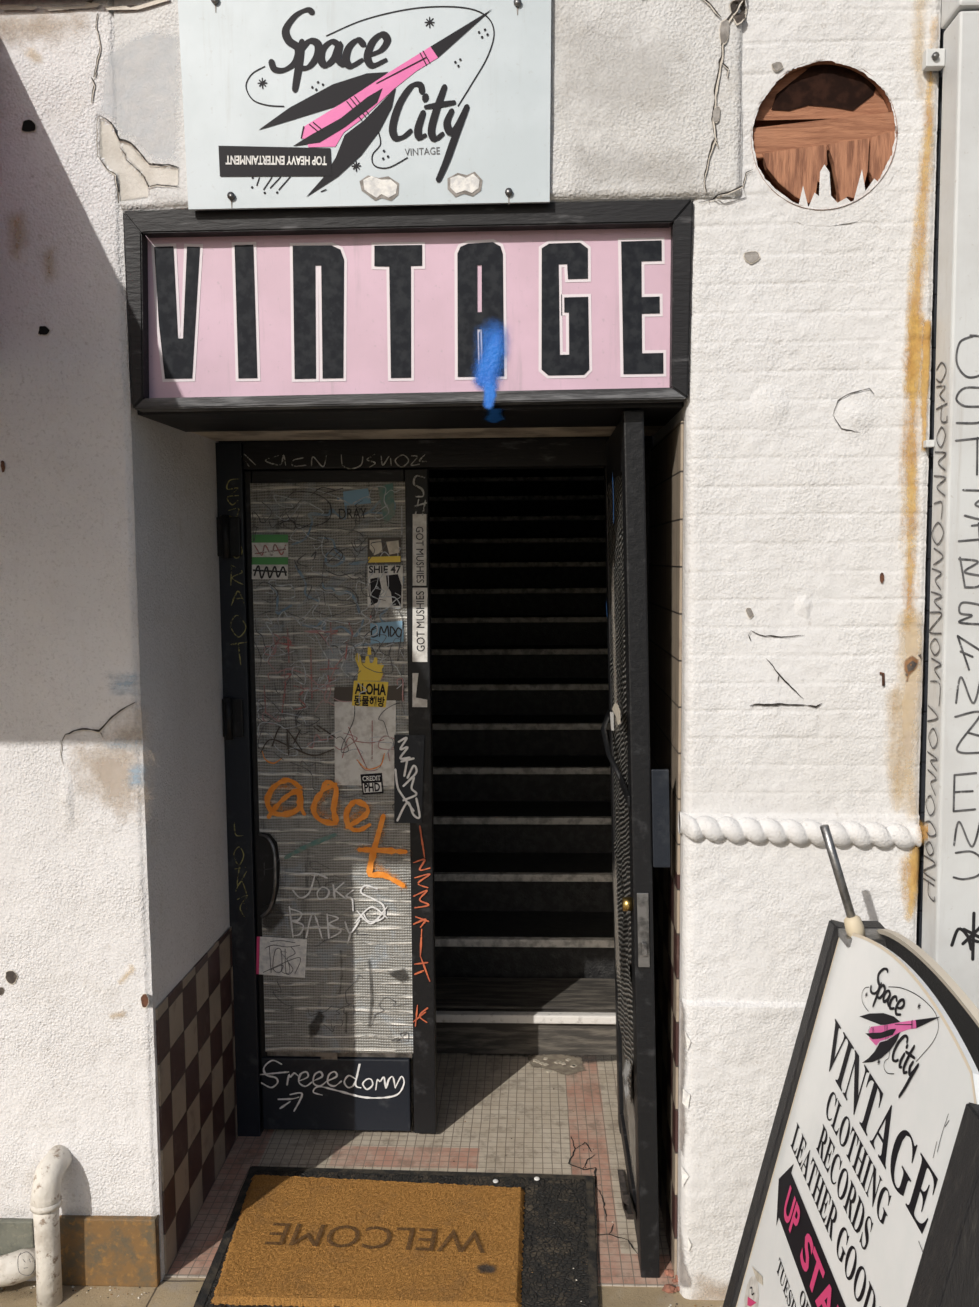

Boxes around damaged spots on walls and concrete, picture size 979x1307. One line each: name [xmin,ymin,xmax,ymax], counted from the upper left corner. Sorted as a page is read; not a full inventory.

crack [91,13,179,203]
crack [698,0,753,204]
peeling [99,120,178,201]
rust [905,656,918,681]
rust [904,826,928,915]